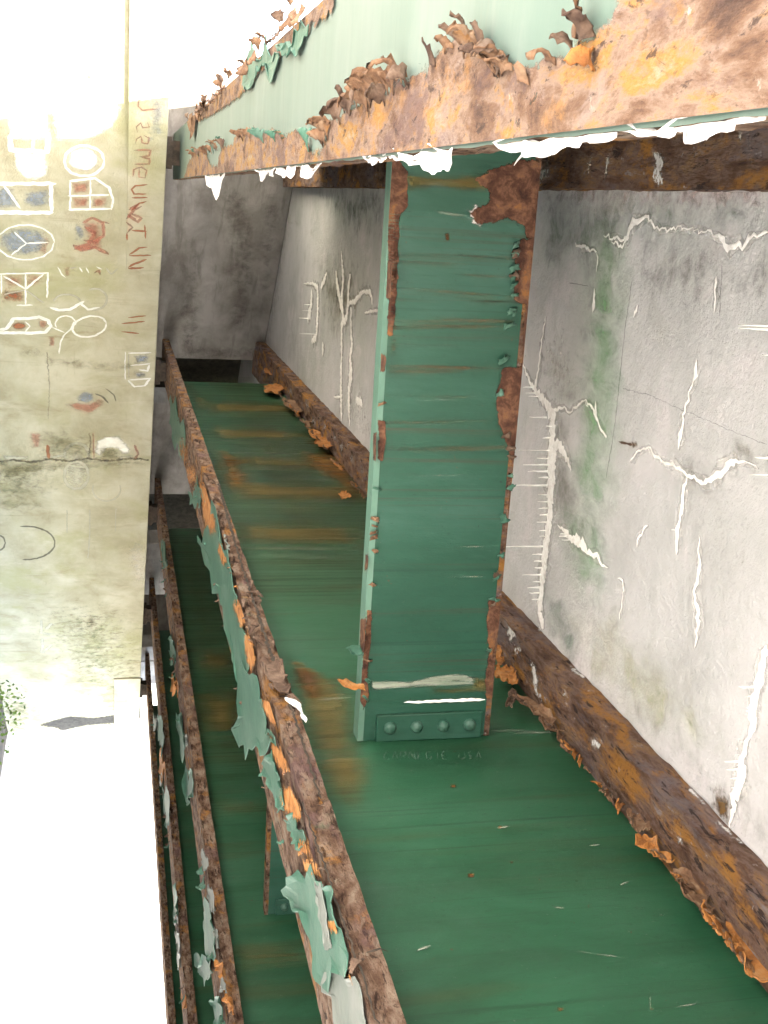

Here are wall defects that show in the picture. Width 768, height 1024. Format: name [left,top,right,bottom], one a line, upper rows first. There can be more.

peeling [362,143,453,175]
peeling [492,116,766,158]
crack [304,251,378,426]
corrosion [184,0,768,551]
crack [575,215,768,312]
crack [506,316,626,629]
crack [629,360,768,648]
peeling [168,395,366,1024]
corrosion [248,625,320,722]
corrosion [360,610,372,710]
peeling [486,645,768,983]
corrosion [714,796,728,817]